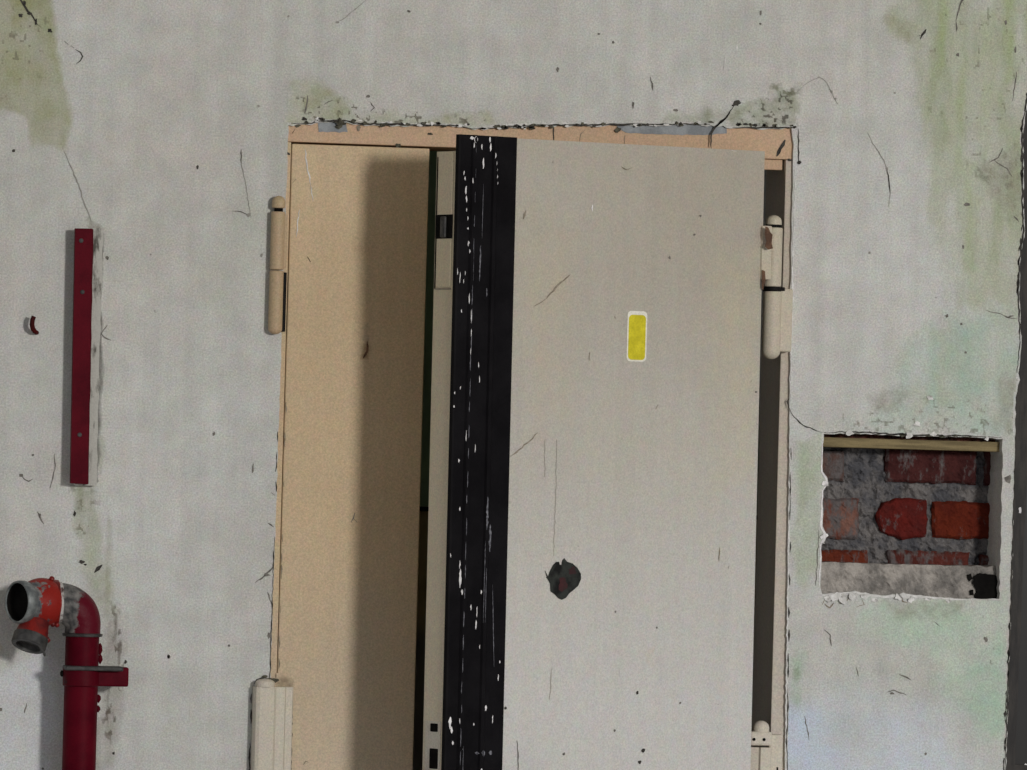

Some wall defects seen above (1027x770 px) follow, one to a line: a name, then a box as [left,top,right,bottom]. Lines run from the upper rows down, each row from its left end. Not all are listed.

crack [956,0,964,57]
crack [710,100,741,149]
crack [867,132,891,203]
leakage [0,0,122,666]
flaking render [815,421,1002,608]